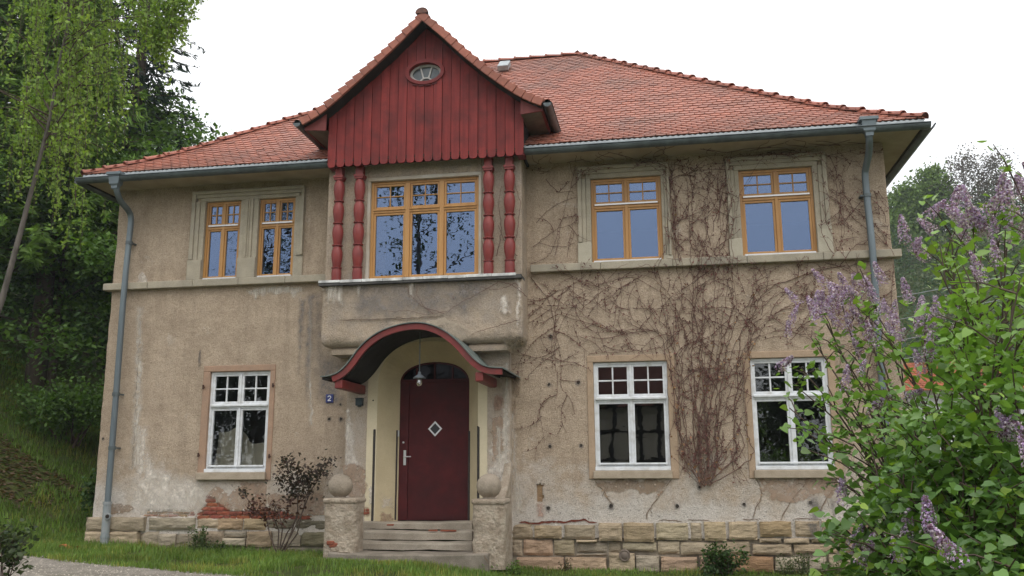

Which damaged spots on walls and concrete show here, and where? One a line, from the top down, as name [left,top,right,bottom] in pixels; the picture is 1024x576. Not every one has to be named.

peeling [500,281,522,322]
spalling [111,482,324,520]